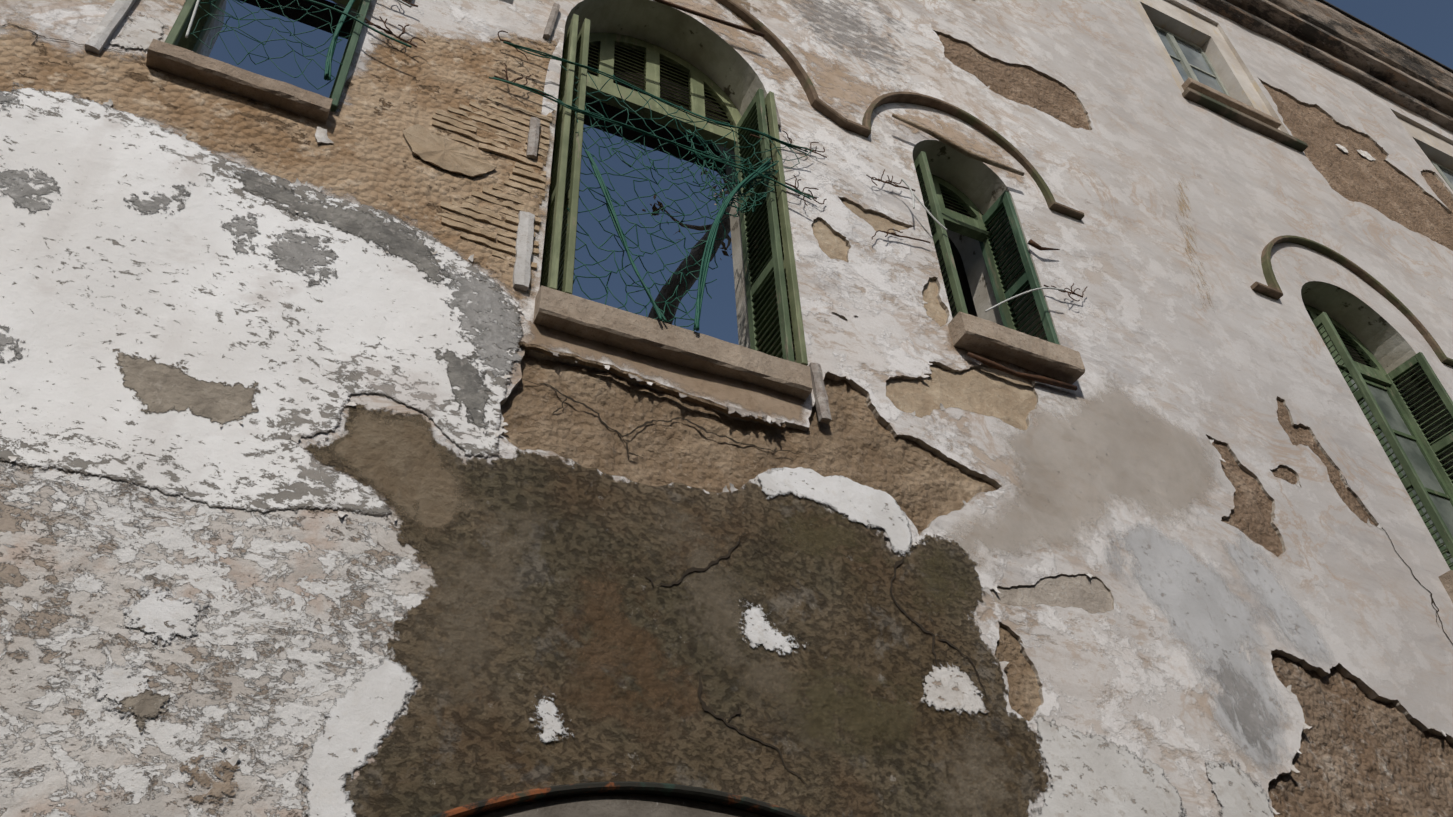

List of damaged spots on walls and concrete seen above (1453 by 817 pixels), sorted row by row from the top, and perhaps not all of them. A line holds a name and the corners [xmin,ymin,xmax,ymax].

flaking render [932,29,1093,130]
flaking render [1258,78,1453,251]
peeling [0,21,1038,545]
flaking render [1206,434,1302,557]
flaking render [1276,396,1384,531]
spalling [989,572,1114,614]
crack [1344,477,1453,644]
peeling [116,684,170,733]
peeling [179,740,240,813]
flaking render [994,621,1044,721]
peeling [1205,659,1277,754]
flaking render [1268,649,1453,817]